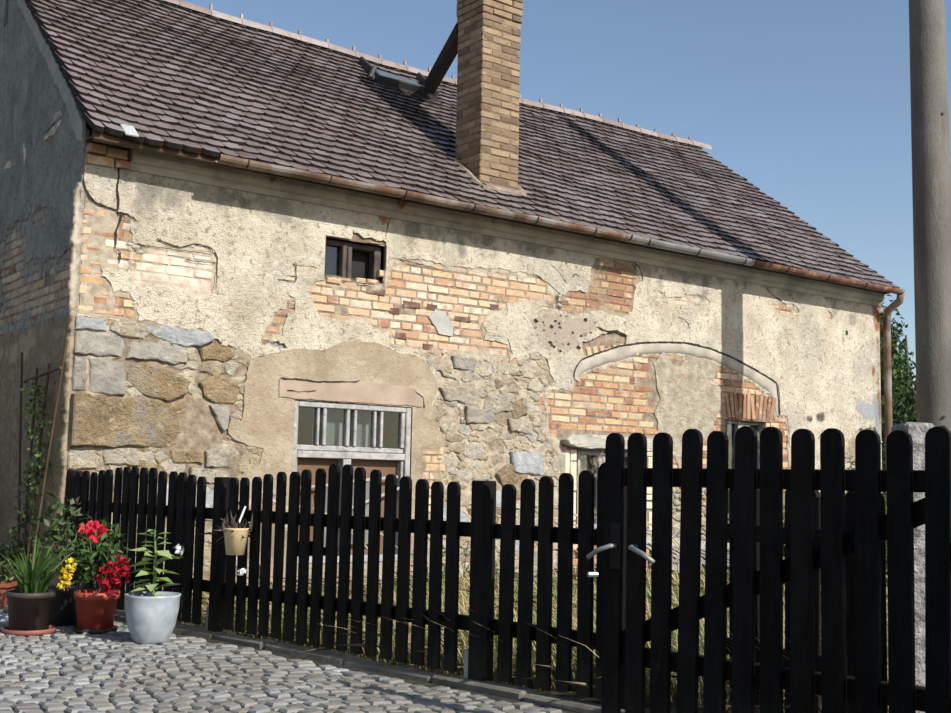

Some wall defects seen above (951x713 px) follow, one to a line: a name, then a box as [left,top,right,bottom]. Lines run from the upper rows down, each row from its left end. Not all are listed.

crack [83,168,218,283]
spalling [351,230,384,245]
spalling [0,182,263,580]
spalling [260,257,791,533]
spalling [238,489,300,513]
spalling [459,536,471,580]